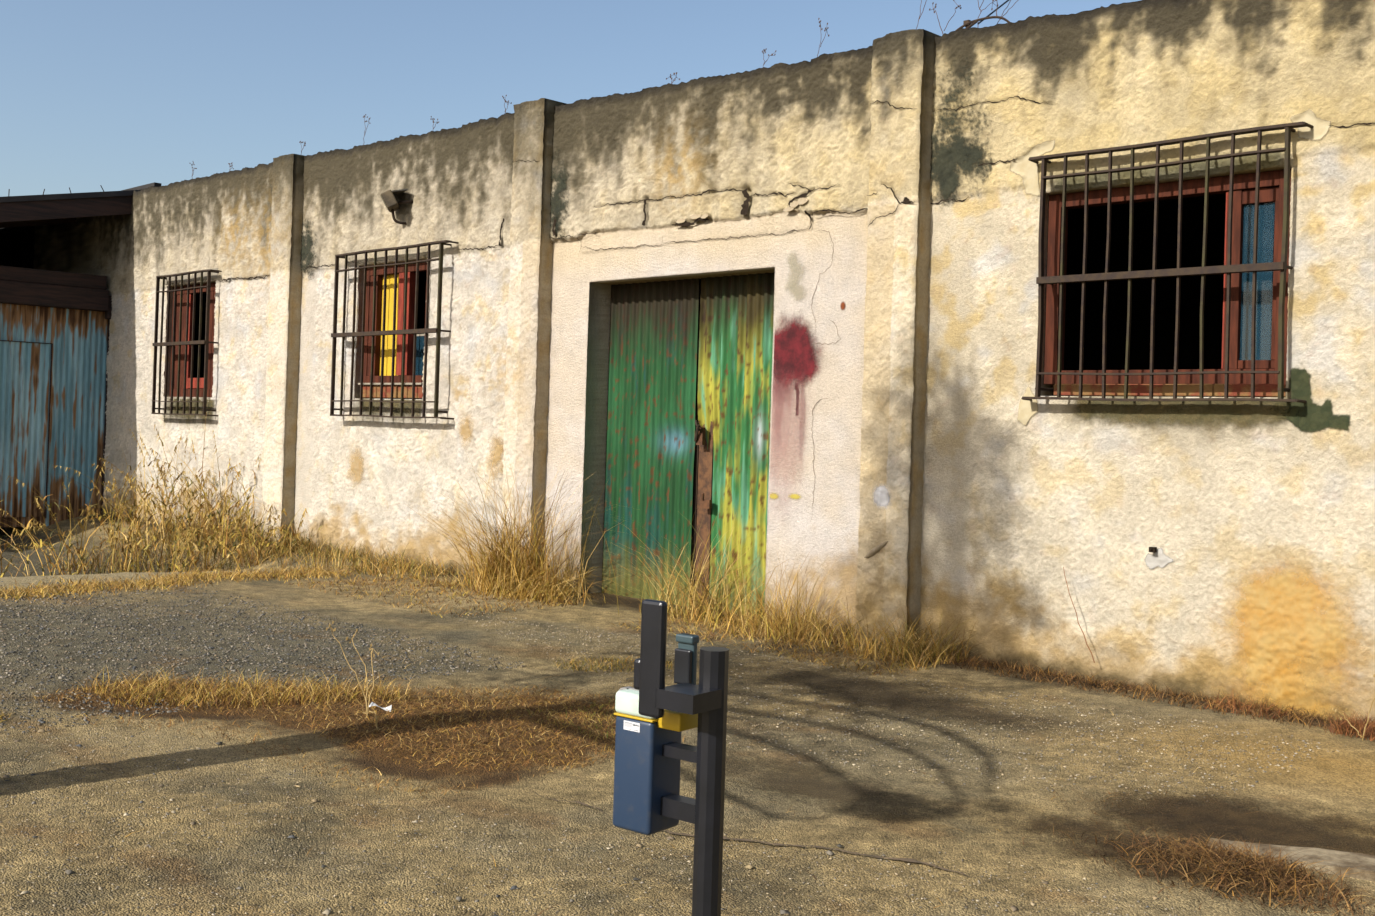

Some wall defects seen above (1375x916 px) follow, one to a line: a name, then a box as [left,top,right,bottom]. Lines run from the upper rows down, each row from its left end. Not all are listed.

leakage [930,64,992,206]